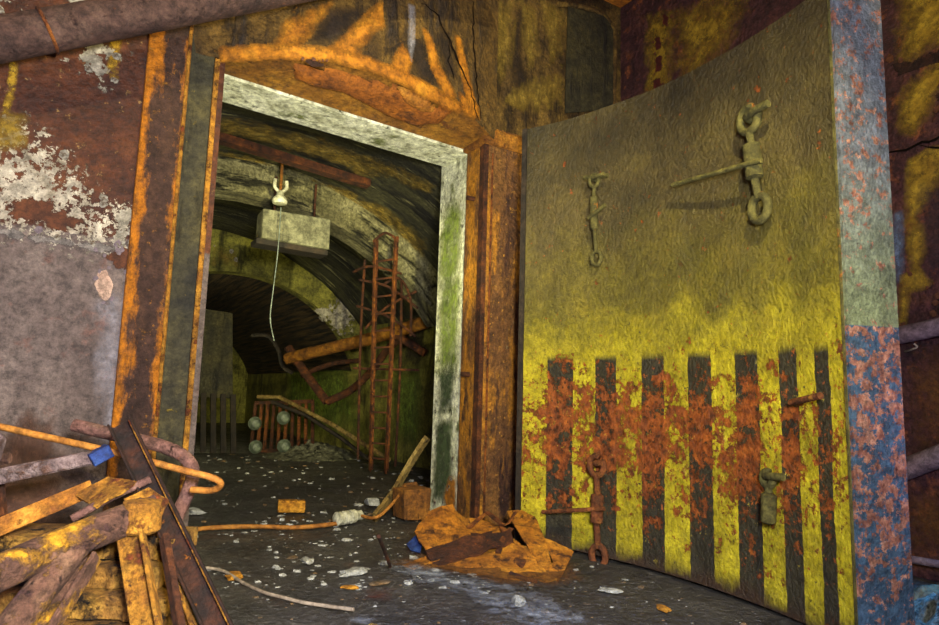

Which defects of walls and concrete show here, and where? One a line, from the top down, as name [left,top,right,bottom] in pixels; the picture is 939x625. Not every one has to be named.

peeling [61,40,122,92]
crack [421,2,481,120]
crack [889,136,939,153]
peeling [0,111,132,304]